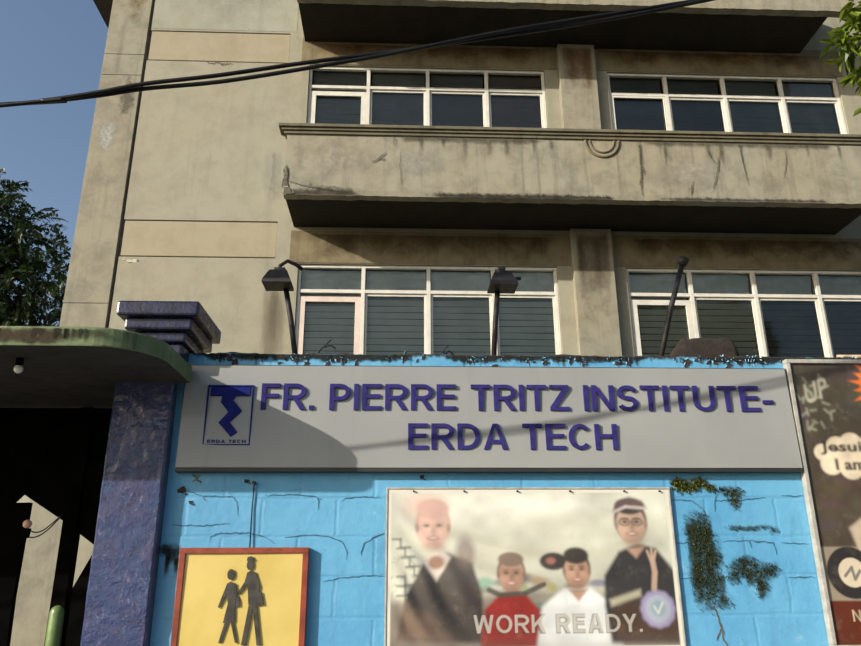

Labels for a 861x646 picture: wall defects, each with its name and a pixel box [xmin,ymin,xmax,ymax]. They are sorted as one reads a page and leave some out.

crack [638,146,646,195]
crack [690,150,749,195]
damp [0,328,104,343]
crack [173,474,385,582]